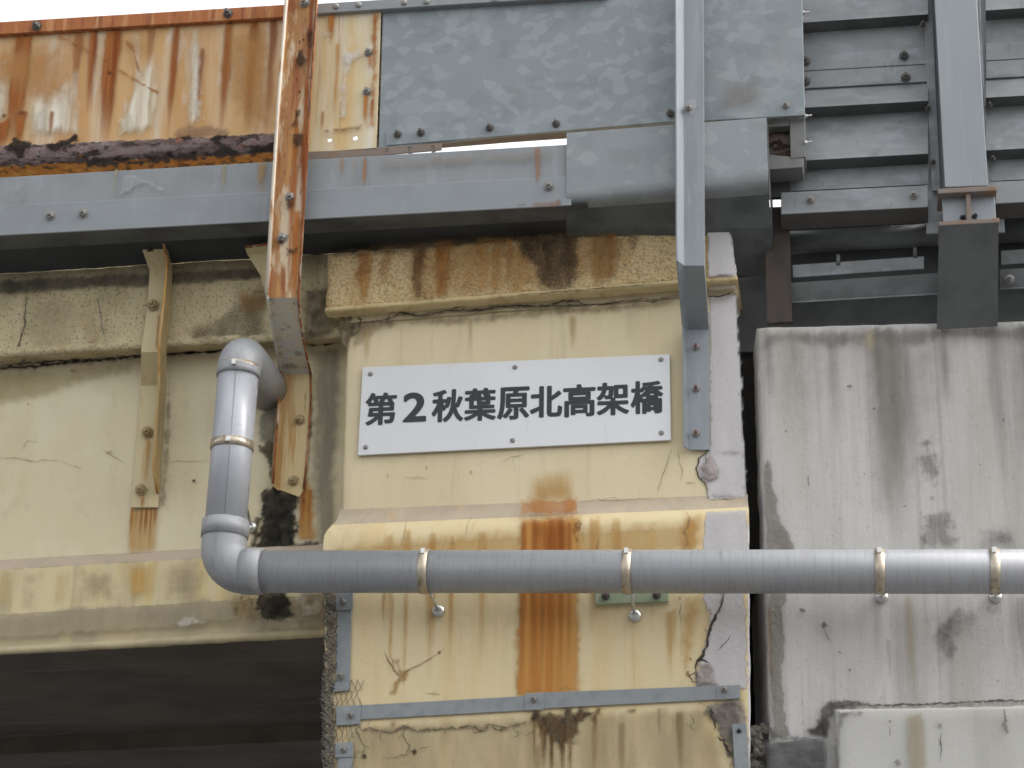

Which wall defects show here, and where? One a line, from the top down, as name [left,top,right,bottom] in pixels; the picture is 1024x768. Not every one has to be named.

rust [74,29,121,117]
rust [168,26,179,110]
crack [0,297,141,369]
crack [361,283,667,323]
leakage [518,233,577,287]
peeling [697,232,747,550]
leakage [251,442,303,547]
rust [374,486,593,550]
leakage [255,593,294,622]
rust [517,593,578,695]
crack [689,594,729,682]
peeling [686,594,748,766]